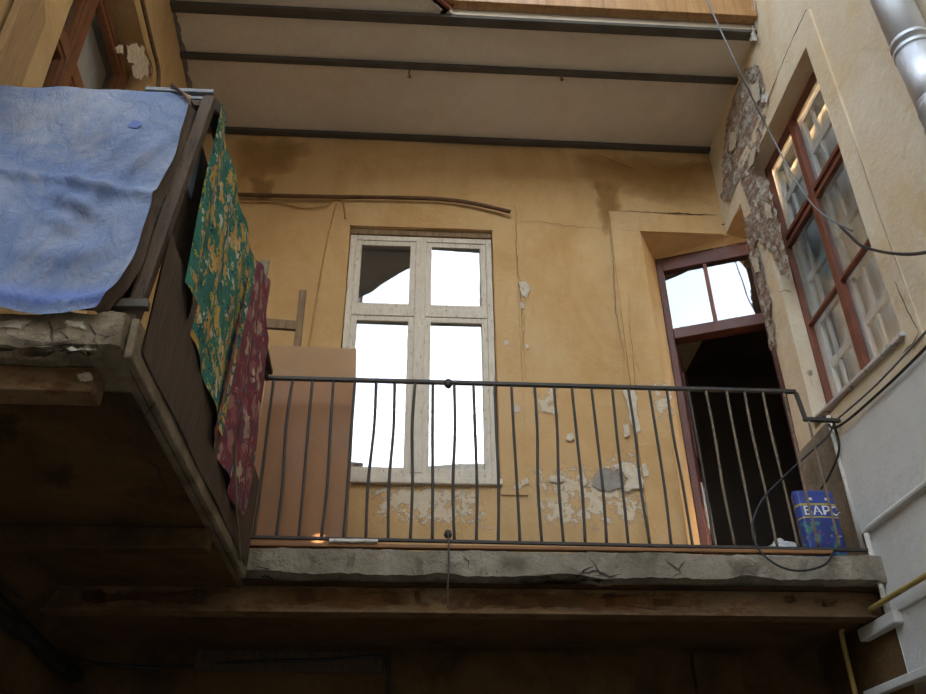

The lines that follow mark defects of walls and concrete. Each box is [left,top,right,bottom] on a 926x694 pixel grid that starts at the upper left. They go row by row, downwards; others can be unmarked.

peeling [116,42,153,81]
damp [612,163,690,195]
damp [599,192,618,219]
flaking render [720,64,791,350]
crack [486,203,714,401]
spalling [21,339,93,356]
peeling [623,390,641,437]
flaking render [583,460,649,492]
crack [575,559,609,580]